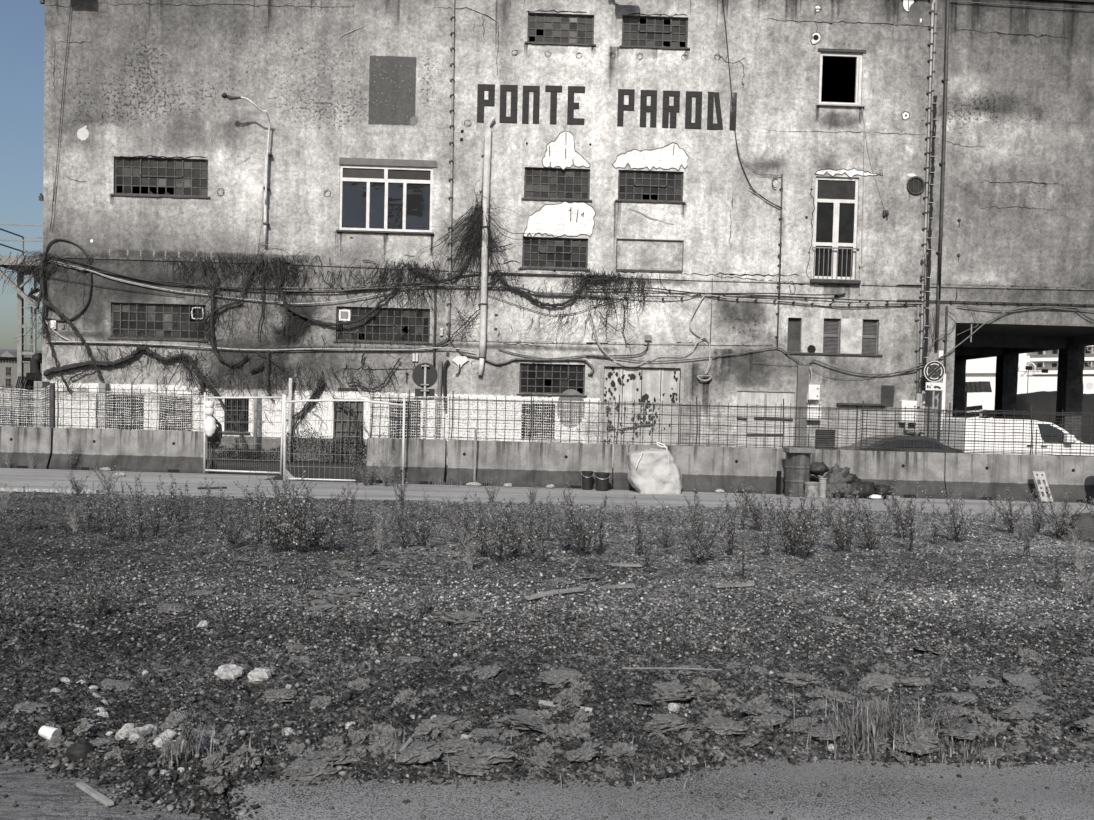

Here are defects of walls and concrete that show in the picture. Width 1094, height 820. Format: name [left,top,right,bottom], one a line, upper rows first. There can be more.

flaking render [542,131,592,170]
flaking render [612,142,690,171]
flaking render [814,168,883,178]
flaking render [523,201,596,238]